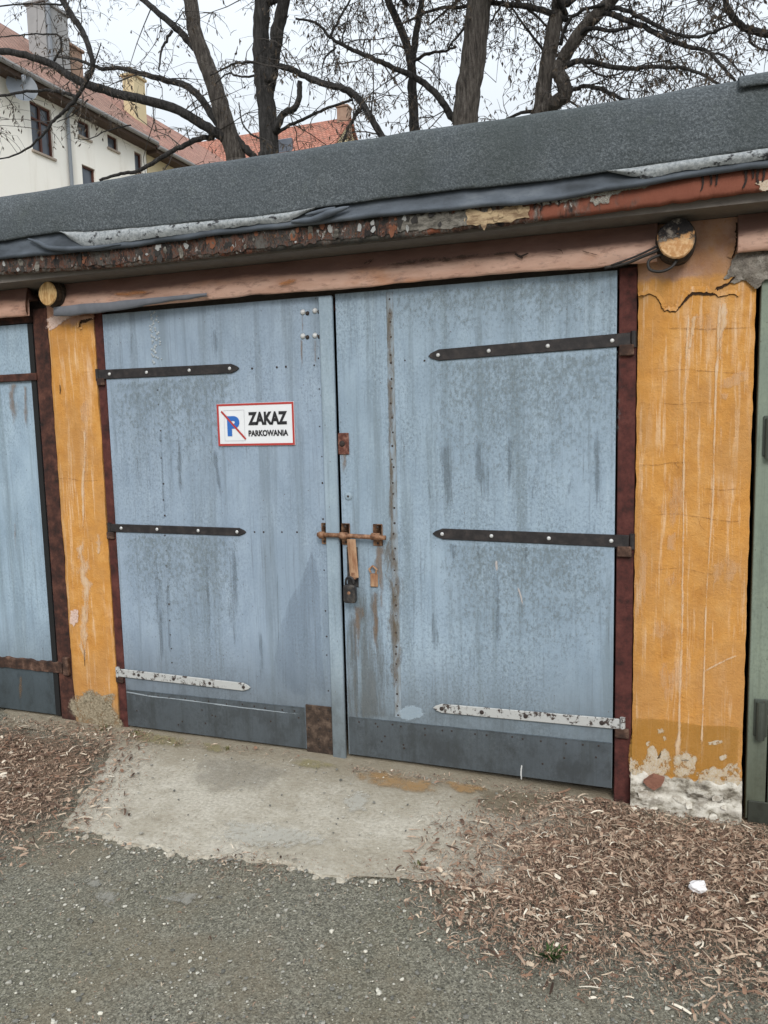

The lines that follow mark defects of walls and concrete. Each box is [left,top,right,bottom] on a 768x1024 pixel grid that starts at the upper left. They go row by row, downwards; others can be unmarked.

peeling [0,185,650,272]
crack [638,222,740,312]
flaking render [724,250,768,289]
damp [713,303,727,445]
flaking render [70,690,122,728]
flaking render [629,728,742,825]